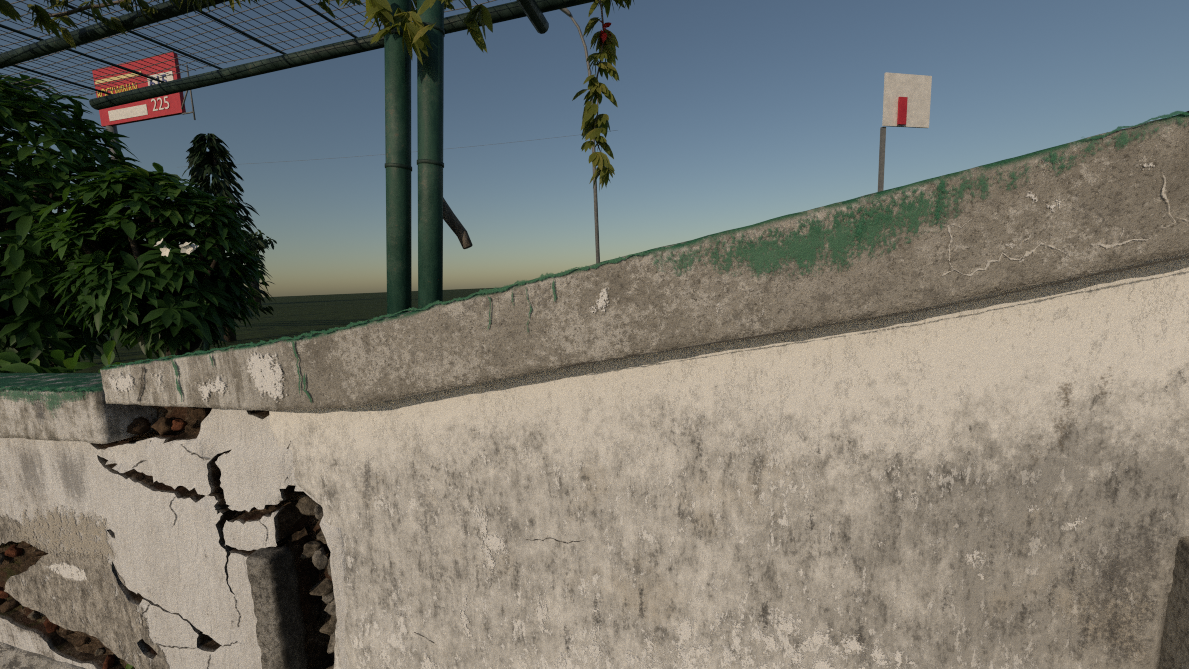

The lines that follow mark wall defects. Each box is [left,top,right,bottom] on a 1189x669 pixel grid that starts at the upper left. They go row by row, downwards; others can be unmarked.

crack [557,175,1189,369]
spalling [90,369,228,450]
peeling [246,350,287,419]
peeling [0,504,170,669]
crack [97,438,308,669]
spalling [274,491,337,669]